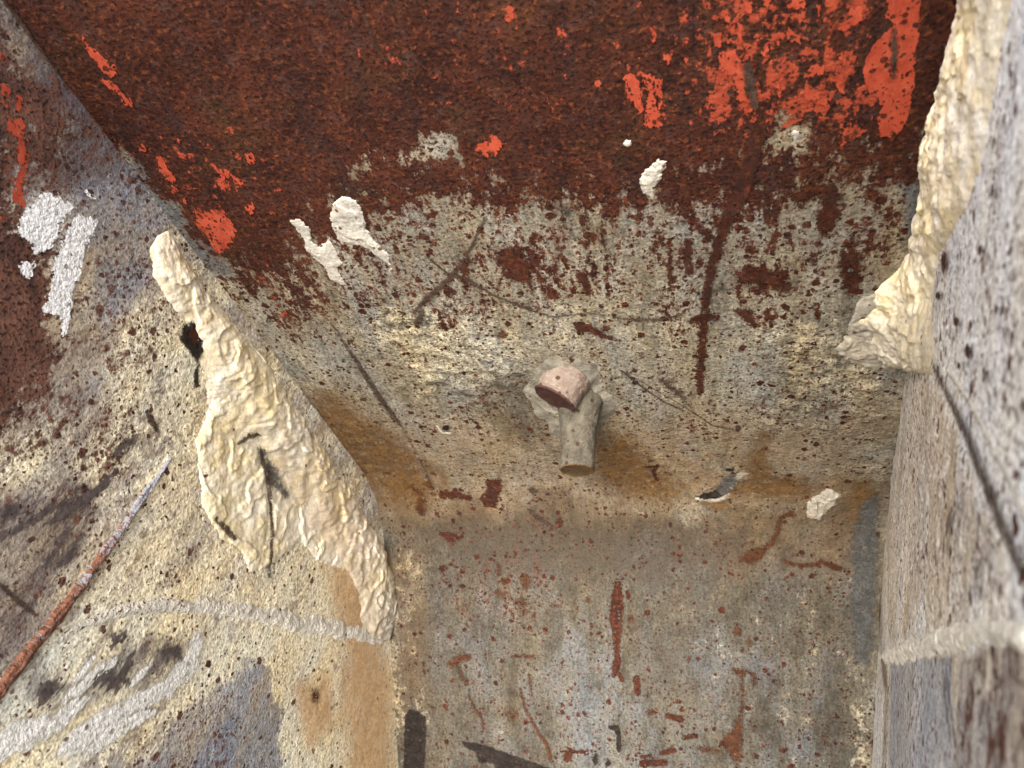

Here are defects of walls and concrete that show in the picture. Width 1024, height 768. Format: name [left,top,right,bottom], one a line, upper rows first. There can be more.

corrosion [790,163,846,233]
corrosion [460,255,472,284]
corrosion [493,244,534,296]
corrosion [575,187,611,298]
corrosion [665,122,771,396]
corrosion [734,263,797,311]
corrosion [838,231,866,297]
corrosion [573,321,621,342]
corrosion [608,578,641,696]